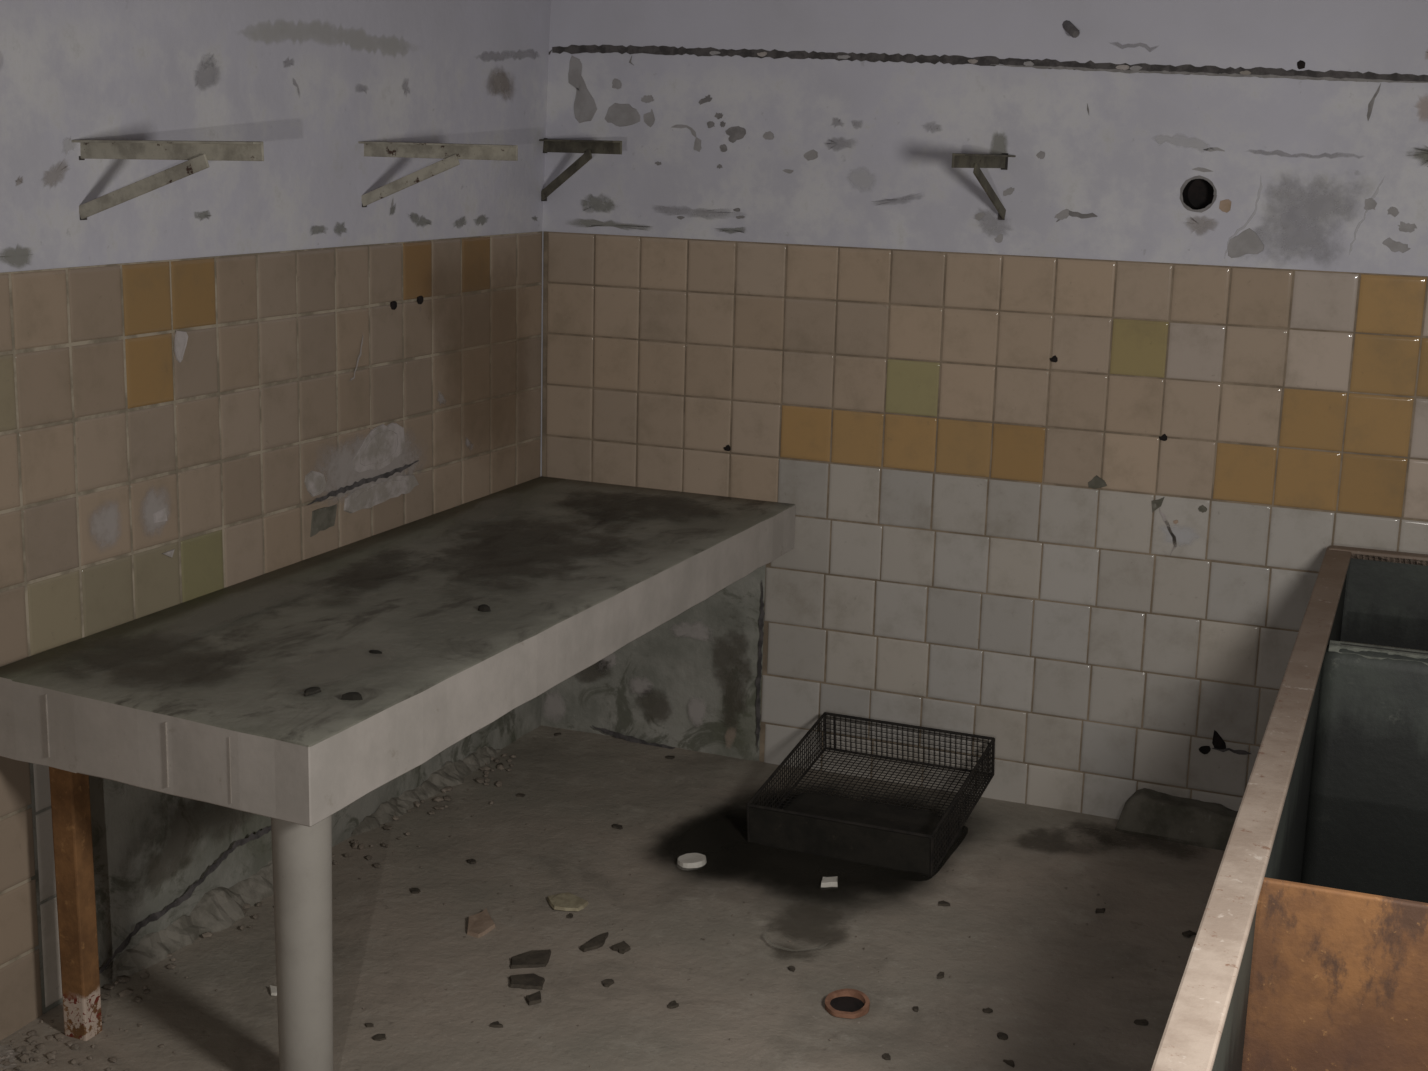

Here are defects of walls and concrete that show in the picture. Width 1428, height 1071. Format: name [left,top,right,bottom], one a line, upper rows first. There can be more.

peeling [568,56,655,127]
peeling [672,95,746,169]
spalling [304,423,419,537]